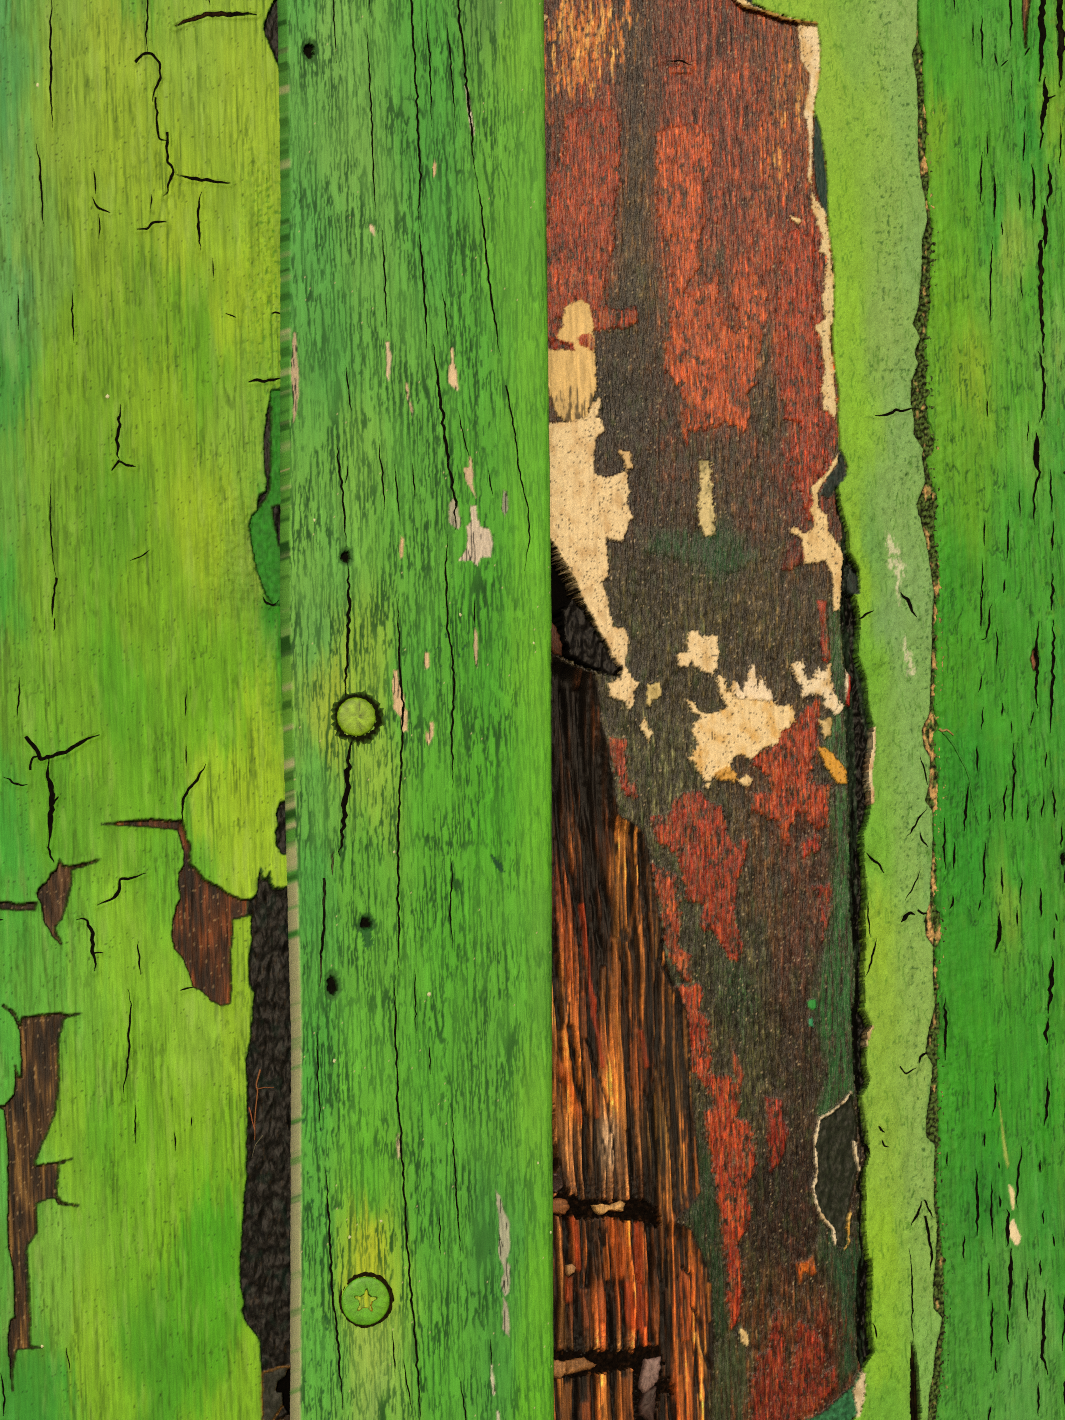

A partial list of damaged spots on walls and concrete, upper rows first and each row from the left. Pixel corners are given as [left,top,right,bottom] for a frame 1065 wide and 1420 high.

peeling [734,0,819,26]
peeling [1022,0,1033,49]
crack [36,0,53,224]
crack [92,0,257,277]
peeling [548,301,598,422]
peeling [821,452,848,499]
crack [859,0,1065,1420]
peeling [275,802,286,855]
peeling [0,859,101,946]
peeling [102,818,291,1420]
peeling [0,1004,82,1393]